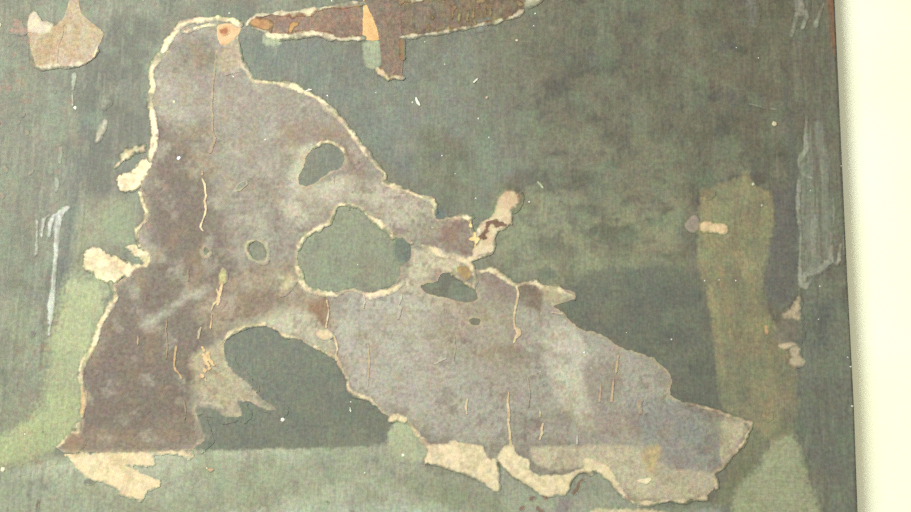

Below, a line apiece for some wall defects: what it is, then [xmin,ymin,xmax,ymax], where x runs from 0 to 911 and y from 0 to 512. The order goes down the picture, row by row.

peeling [26,11,55,35]
peeling [113,143,155,193]
peeling [683,214,729,235]
peeling [81,243,151,286]
peeling [314,328,334,340]
peeling [763,294,806,369]
peeling [199,346,215,382]
peeling [63,449,194,503]
peeling [423,439,671,512]